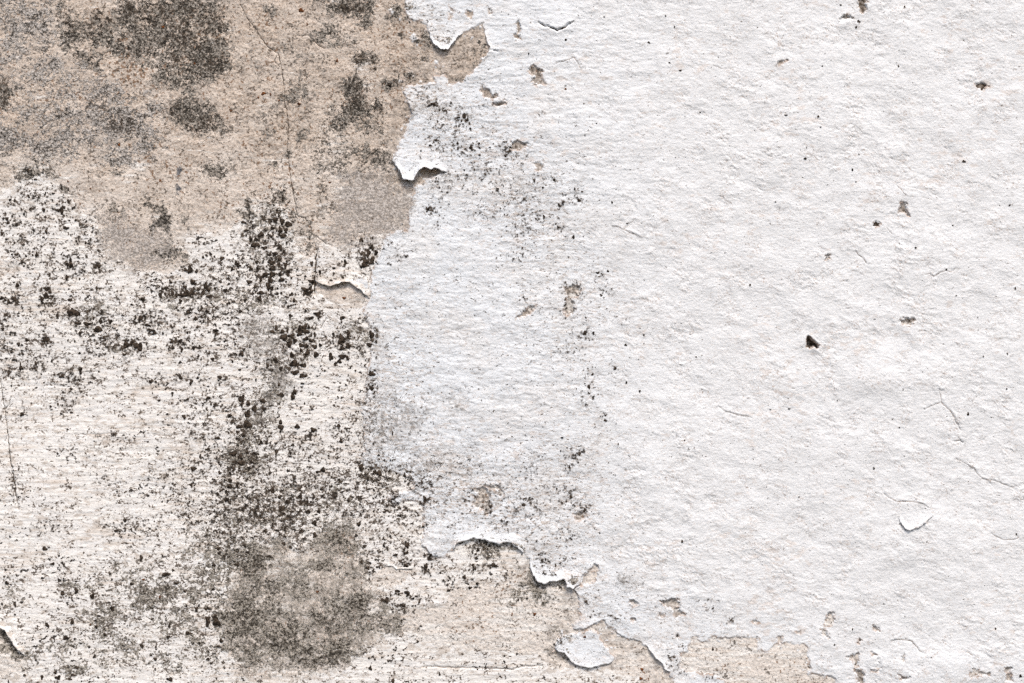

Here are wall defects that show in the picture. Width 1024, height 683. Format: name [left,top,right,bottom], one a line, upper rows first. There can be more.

peeling [0,0,494,276]
crack [240,5,330,292]
damp [0,0,621,682]
peeling [315,270,370,306]
peeling [224,527,835,683]